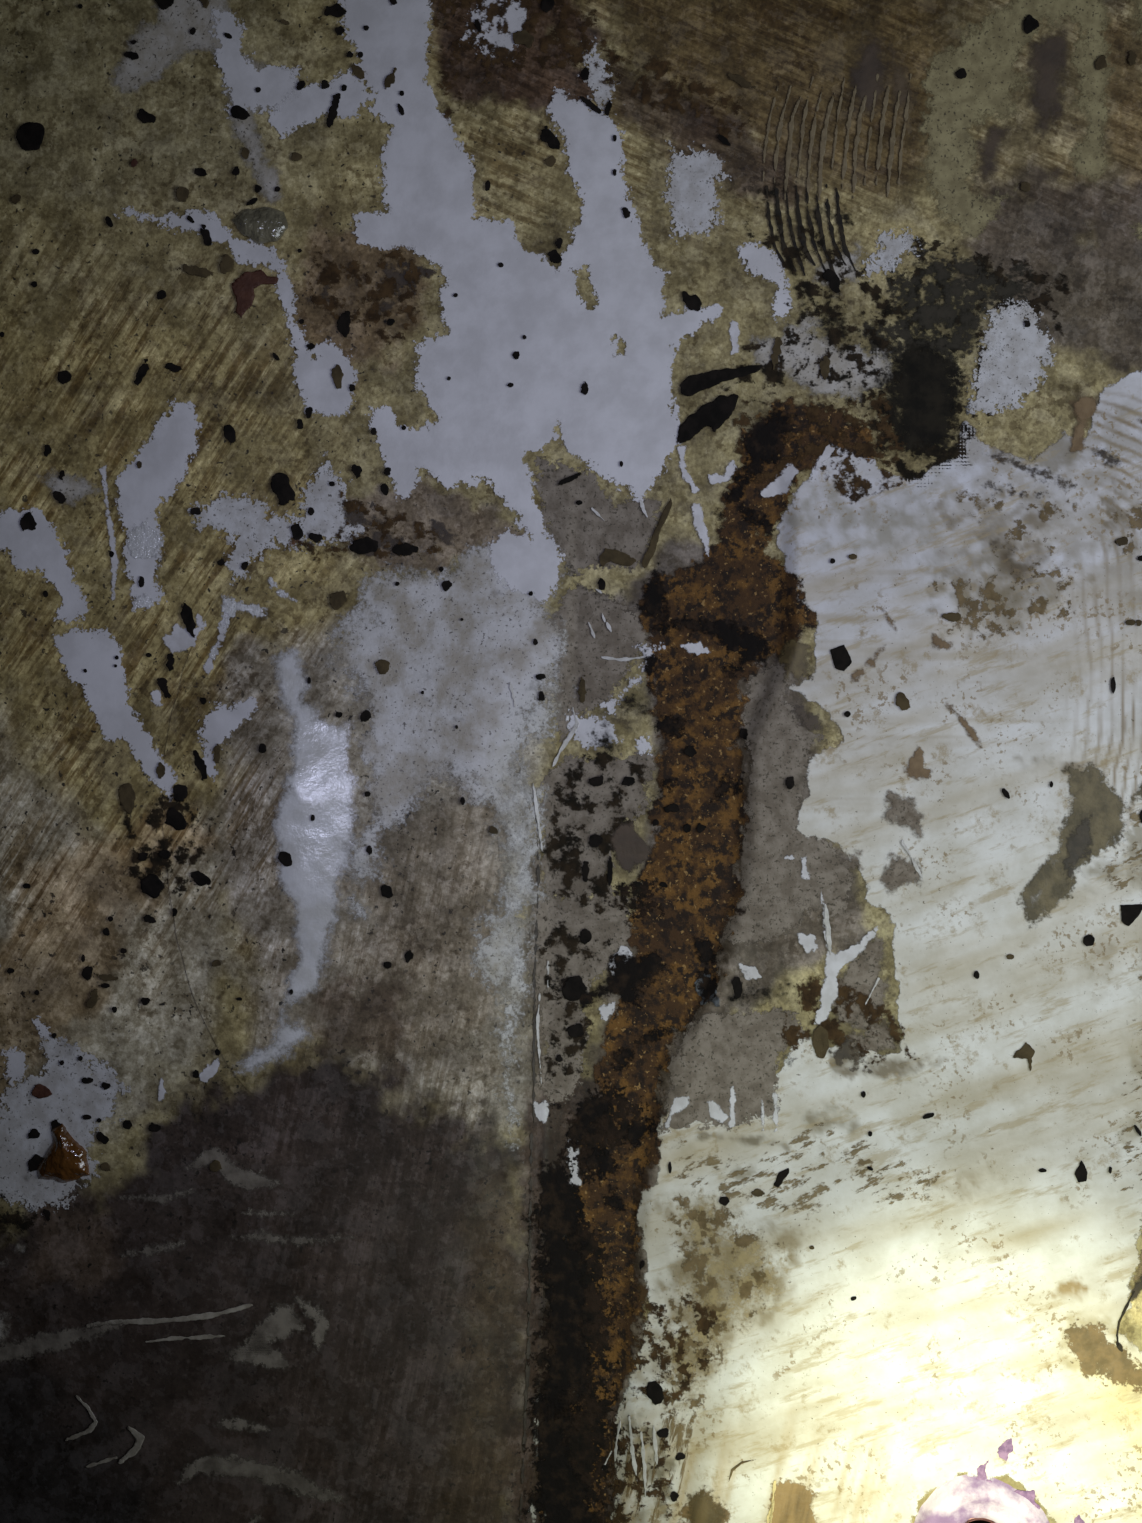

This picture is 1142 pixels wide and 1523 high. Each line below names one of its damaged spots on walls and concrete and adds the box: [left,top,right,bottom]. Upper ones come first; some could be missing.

peeling [920,0,1115,239]
peeling [737,241,891,400]
peeling [815,227,923,284]
peeling [46,398,202,612]
peeling [0,507,180,802]
peeling [113,0,740,1523]
corrosion [549,396,882,1523]
peeling [610,297,1142,1523]
peeling [0,1015,131,1216]
damp [1130,1250,1142,1301]
damp [678,1489,730,1523]
damp [768,1478,818,1523]